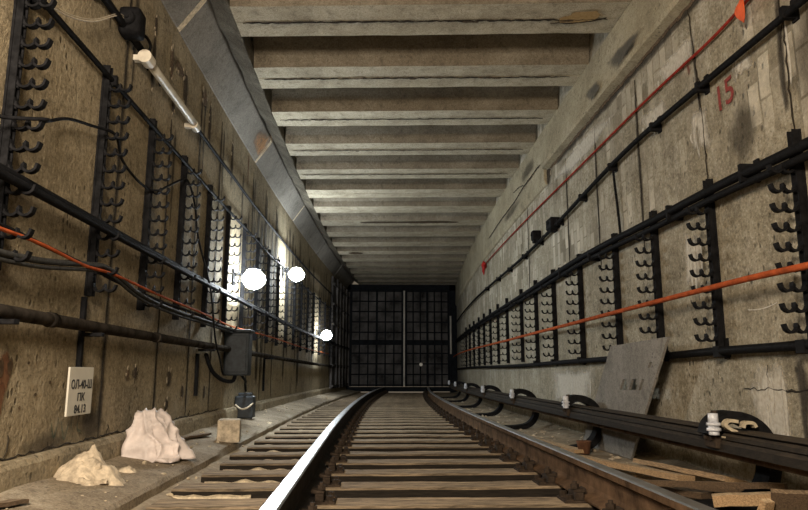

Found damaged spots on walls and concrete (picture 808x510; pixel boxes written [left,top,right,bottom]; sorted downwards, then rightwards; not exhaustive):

spalling [550,11,607,24]
corrosion [0,351,13,414]